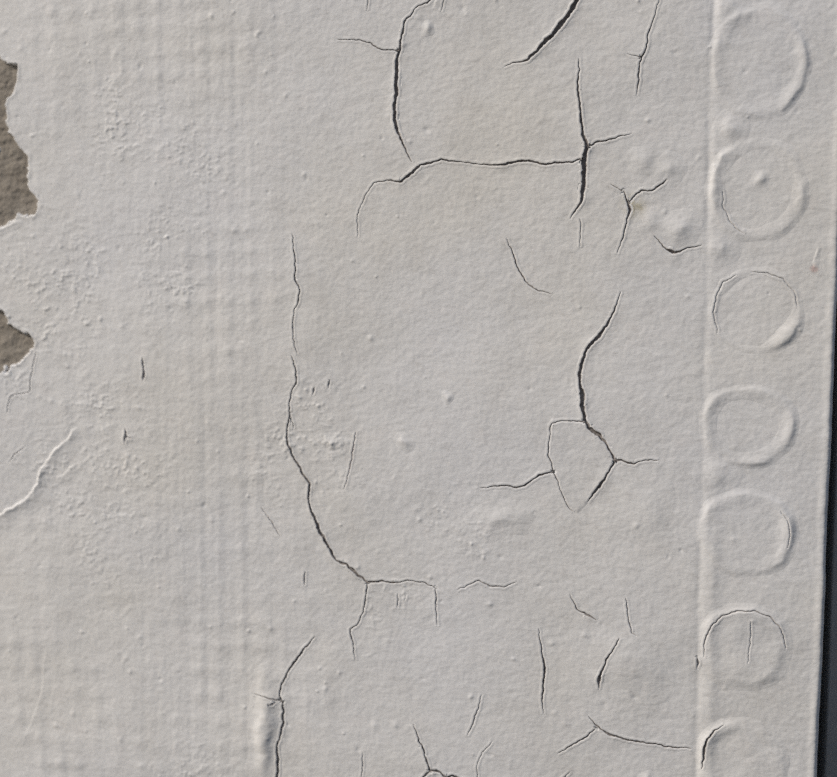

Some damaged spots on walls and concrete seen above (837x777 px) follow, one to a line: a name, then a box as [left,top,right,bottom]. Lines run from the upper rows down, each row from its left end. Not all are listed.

crack [626,0,663,96]
flaking render [0,58,38,237]
crack [336,0,633,247]
crack [609,177,670,254]
crack [652,233,703,257]
flaking render [0,311,35,373]
peeling [0,427,84,537]
crack [283,233,518,661]
crack [479,290,659,514]
crack [253,635,317,777]
crack [411,694,495,777]
crack [556,714,726,777]